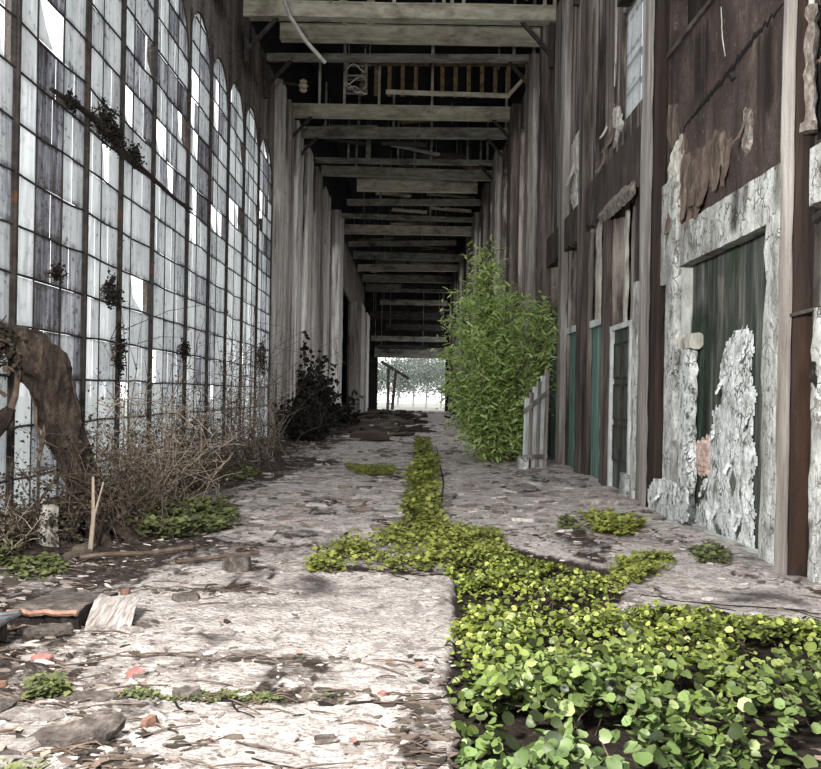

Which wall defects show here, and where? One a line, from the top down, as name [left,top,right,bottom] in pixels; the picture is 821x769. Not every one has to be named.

peeling [664,103,754,235]
peeling [647,325,758,549]